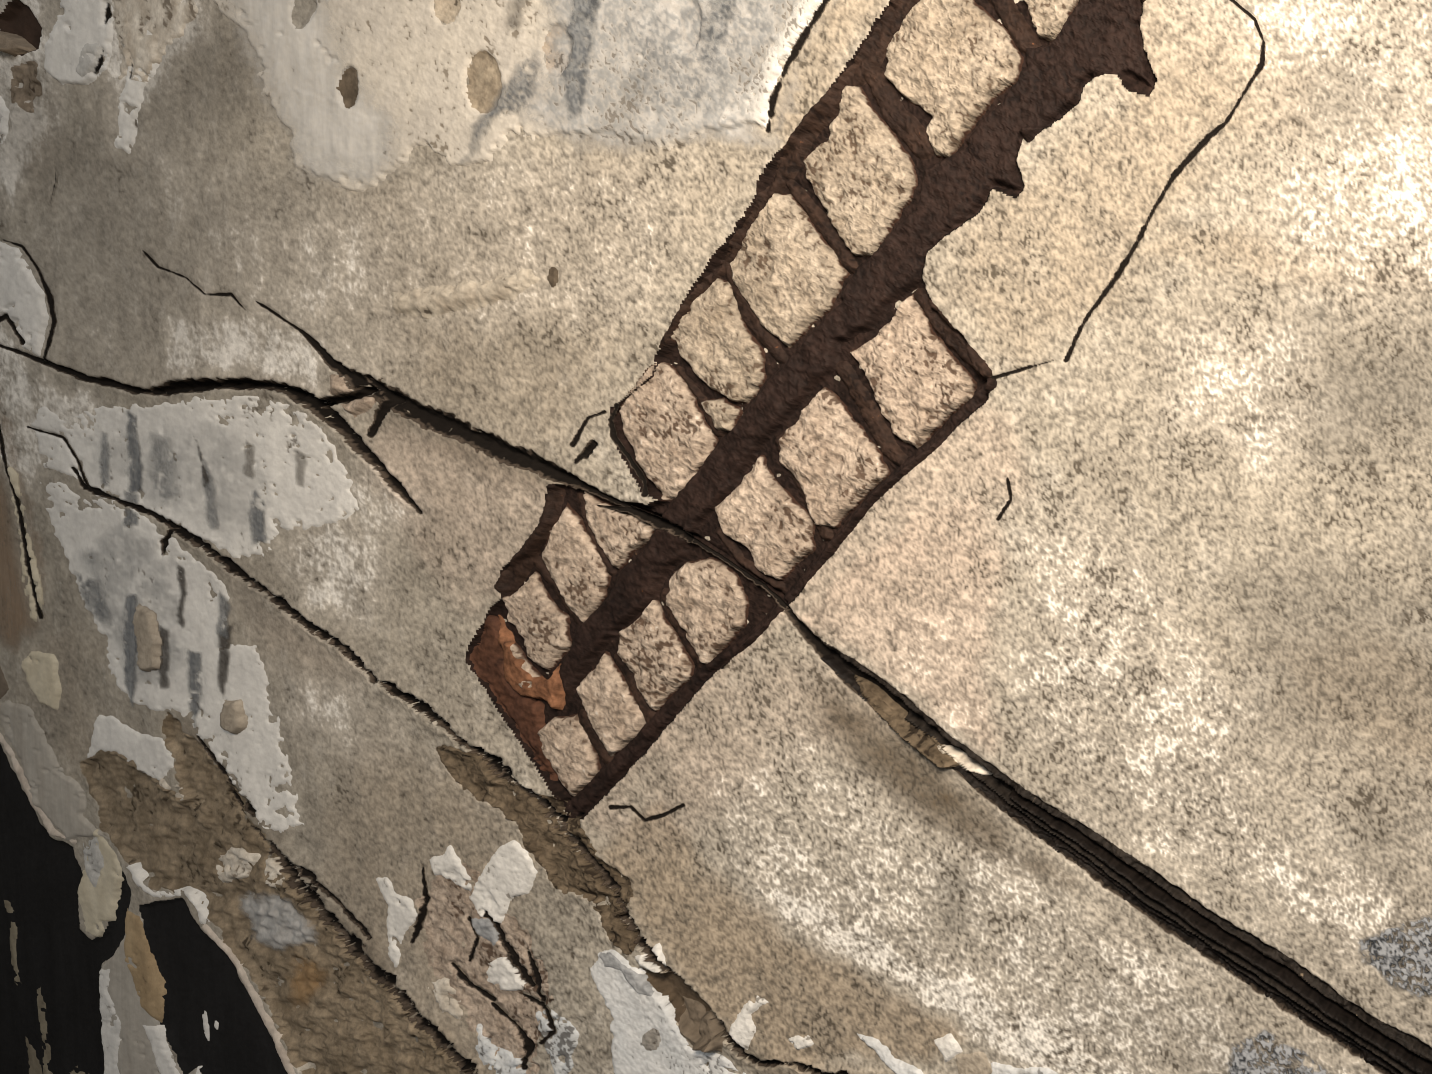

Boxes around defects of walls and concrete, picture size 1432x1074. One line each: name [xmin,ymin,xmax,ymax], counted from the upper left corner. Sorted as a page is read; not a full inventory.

peeling [0,0,589,192]
damp [474,0,797,145]
spalling [1016,0,1079,45]
crack [990,0,1266,379]
peeling [0,242,49,357]
crack [0,239,791,610]
spalling [376,0,1025,1074]
crack [996,477,1012,520]
spalling [0,396,466,1074]
crack [0,426,685,974]
corrosion [470,615,566,781]
crack [720,1020,848,1074]